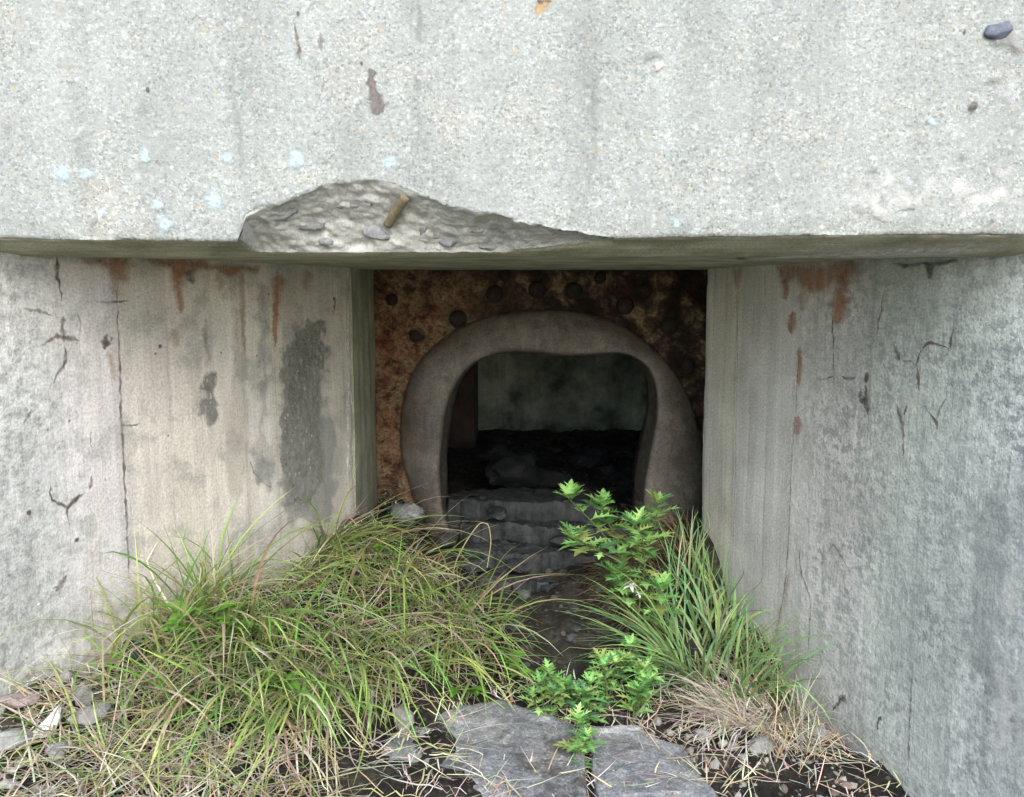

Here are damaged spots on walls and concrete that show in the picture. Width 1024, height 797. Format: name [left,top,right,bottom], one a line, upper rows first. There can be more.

crack [49,259,80,381]
rust [152,259,258,311]
rust [273,277,283,344]
rust [780,261,853,367]
crack [113,276,140,568]
crack [902,333,953,430]
crack [49,488,81,517]